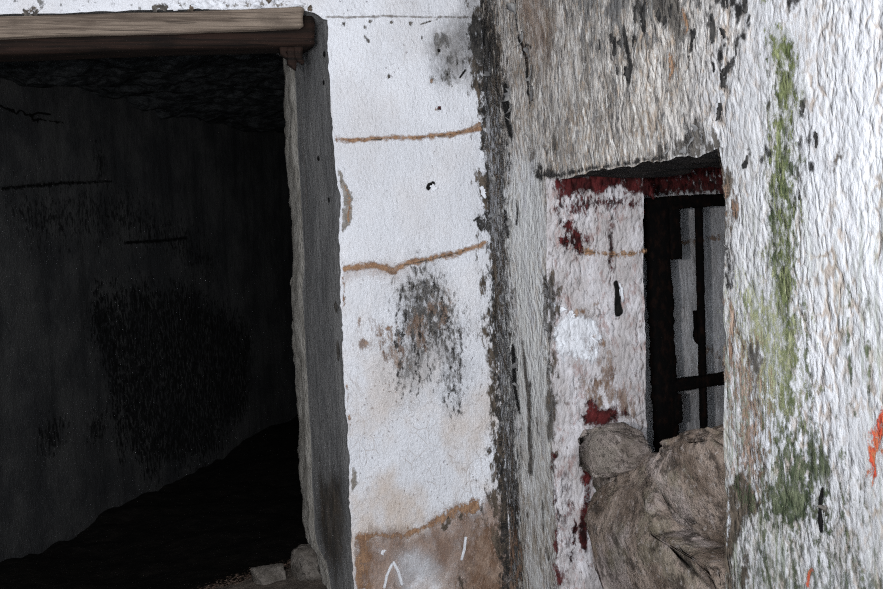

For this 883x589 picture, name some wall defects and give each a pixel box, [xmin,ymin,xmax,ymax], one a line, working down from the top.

leakage [565,0,751,92]
leakage [529,103,734,181]
leakage [742,23,818,434]
leakage [355,0,528,589]
peeling [383,552,429,588]
leakage [754,467,771,589]
leakage [775,416,798,589]
corrosion [865,406,883,484]